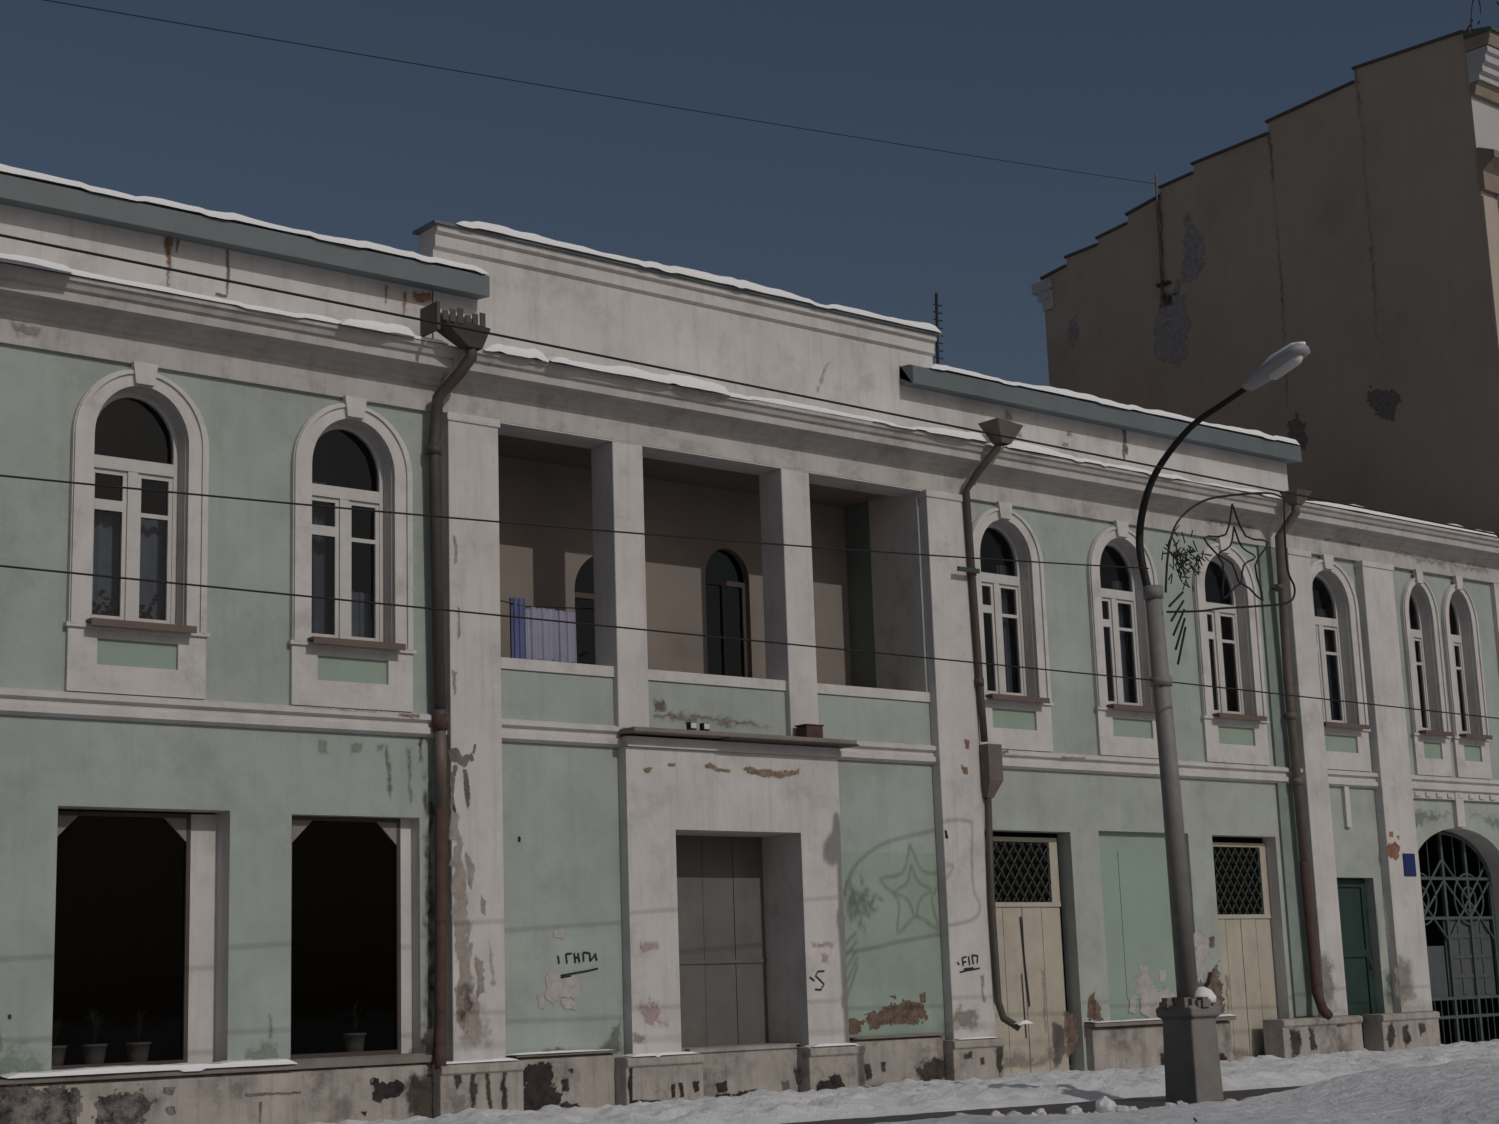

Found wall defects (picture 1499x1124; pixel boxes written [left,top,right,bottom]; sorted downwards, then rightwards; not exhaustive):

rust [165,237,180,285]
spalling [1365,385,1401,421]
spalling [1287,411,1308,451]
flaking render [449,809,486,1033]
spalling [849,992,928,1035]
flaking render [1129,963,1177,1018]
flaking render [1194,930,1226,1014]